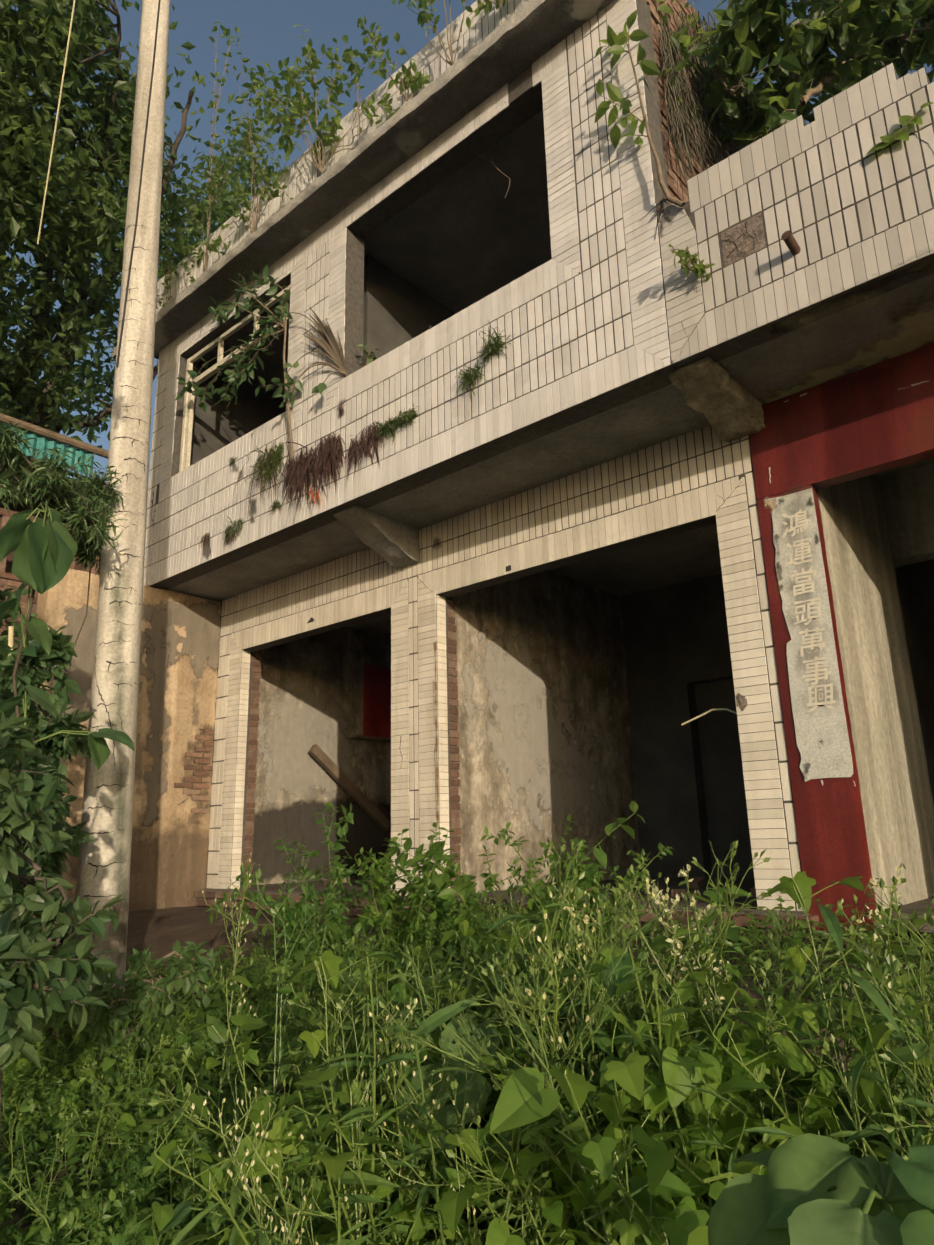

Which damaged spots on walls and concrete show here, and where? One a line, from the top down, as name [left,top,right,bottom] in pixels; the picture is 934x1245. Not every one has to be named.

crack [83,225,154,897]
flaking render [62,605,97,715]
flaking render [138,600,221,693]
flaking render [174,725,214,821]